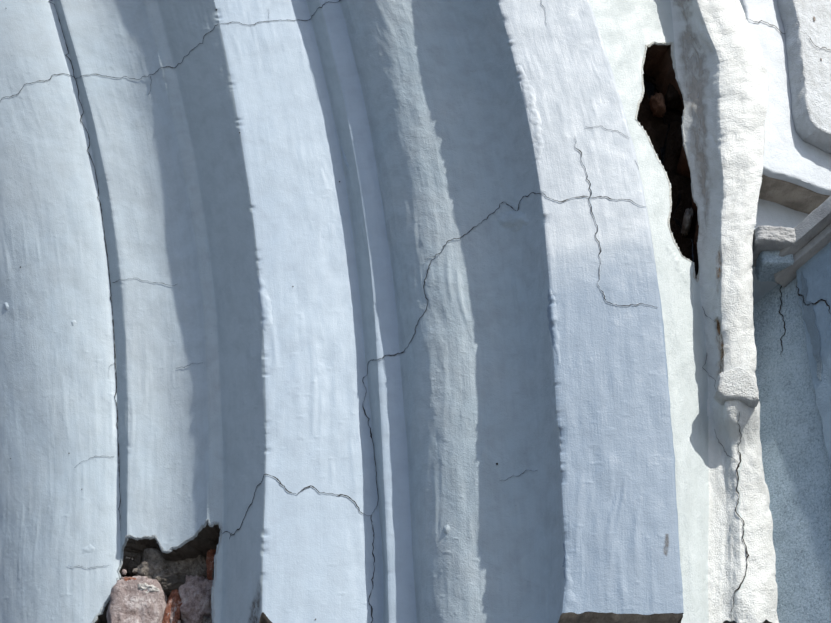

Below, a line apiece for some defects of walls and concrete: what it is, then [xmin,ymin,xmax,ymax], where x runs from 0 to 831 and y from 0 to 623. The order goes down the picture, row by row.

crack [0,0,340,530]
crack [222,125,658,623]
spalling [635,41,700,282]
crack [779,283,831,351]
spalling [91,519,223,623]
crack [714,412,749,623]